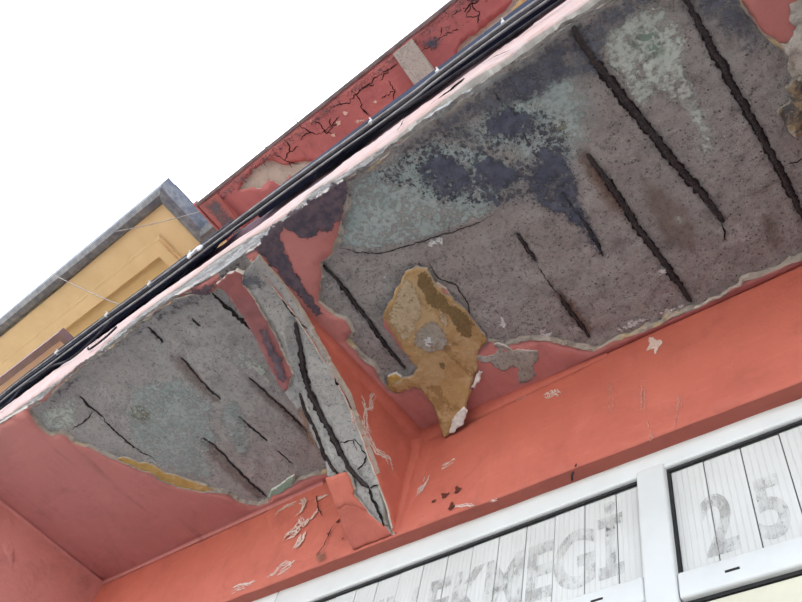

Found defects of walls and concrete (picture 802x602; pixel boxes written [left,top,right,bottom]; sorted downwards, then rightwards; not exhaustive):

crack [421,0,480,52]
spalling [239,161,312,190]
crack [264,64,397,168]
crack [343,214,494,254]
crack [439,78,465,98]
damp [254,0,713,316]
spalling [280,0,802,437]
crack [212,293,250,329]
spalling [0,226,388,525]
crack [340,438,384,526]